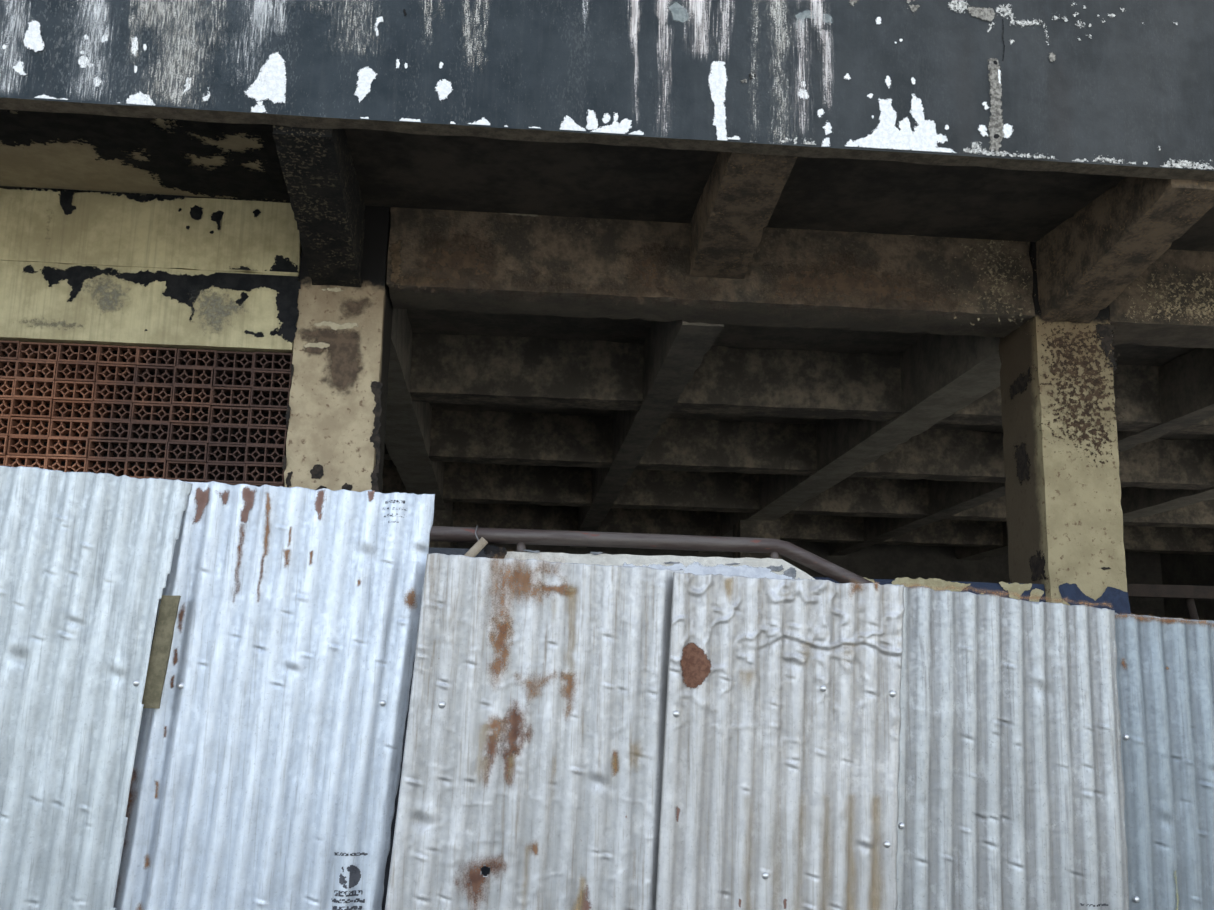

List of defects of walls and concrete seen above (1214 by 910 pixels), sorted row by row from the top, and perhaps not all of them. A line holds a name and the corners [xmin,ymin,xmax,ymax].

peeling [0,52,290,234]
damp [628,0,640,80]
damp [689,0,733,60]
peeling [708,61,832,147]
damp [751,0,832,139]
peeling [846,58,1055,159]
peeling [22,255,330,348]
damp [300,298,370,393]
corrosion [193,487,271,601]
corrosion [490,562,575,711]
corrosion [680,643,711,688]
corrosion [483,705,531,784]